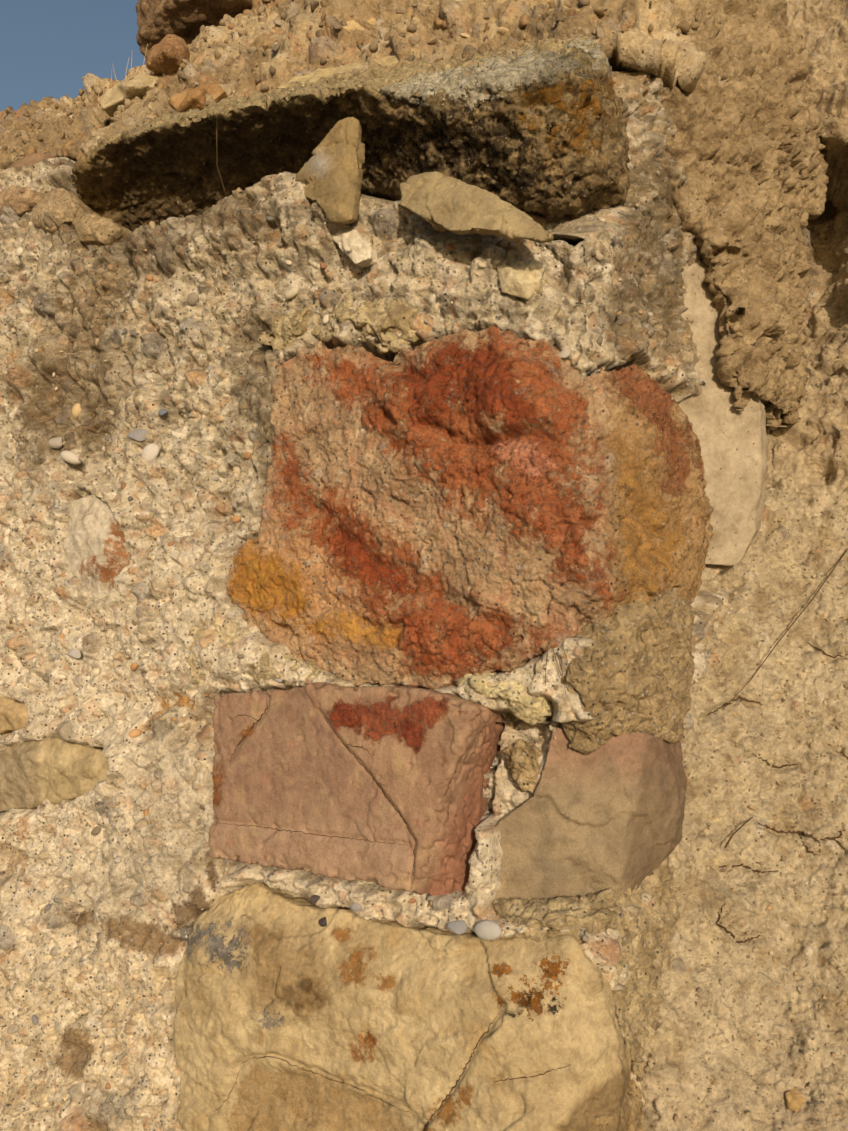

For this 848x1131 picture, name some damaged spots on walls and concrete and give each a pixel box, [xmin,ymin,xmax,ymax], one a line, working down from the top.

crack [752,753,799,769]
crack [758,822,846,855]
crack [719,863,778,873]
crack [715,902,761,943]